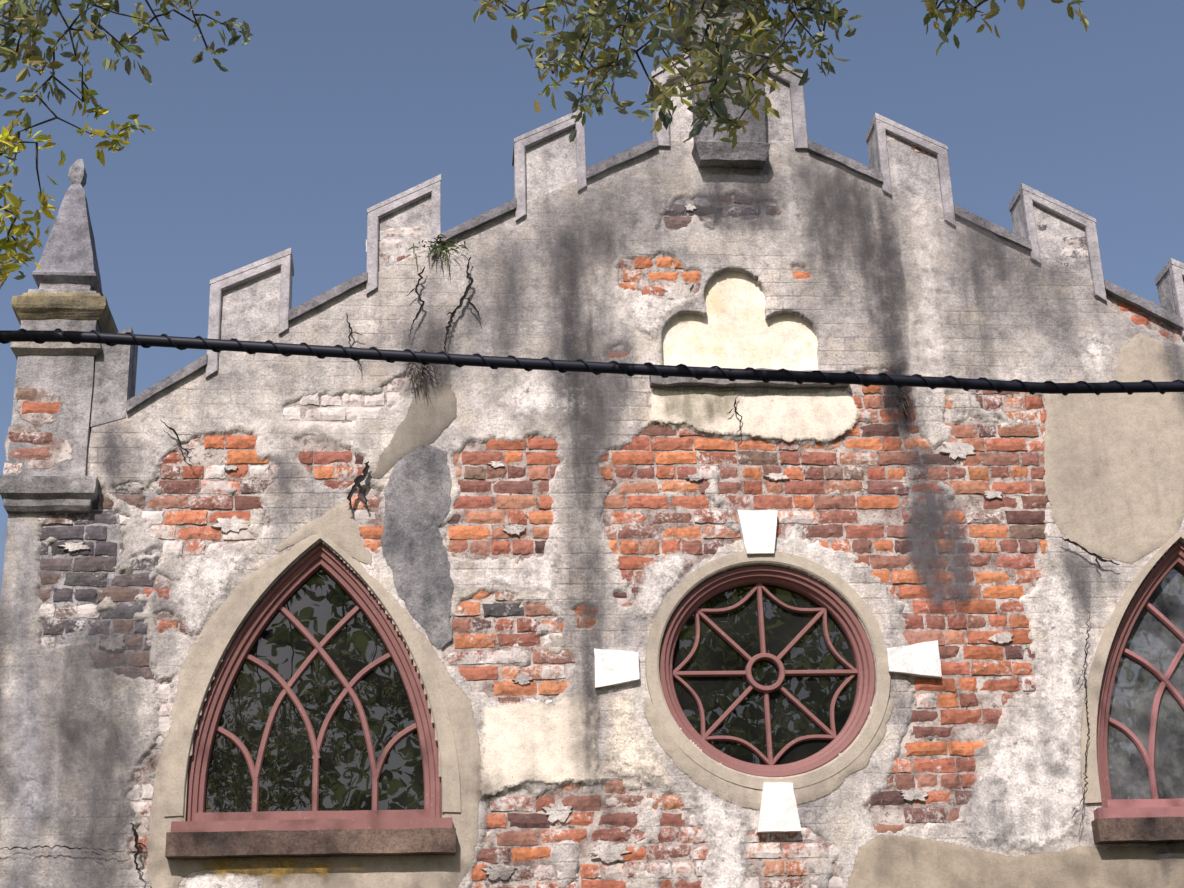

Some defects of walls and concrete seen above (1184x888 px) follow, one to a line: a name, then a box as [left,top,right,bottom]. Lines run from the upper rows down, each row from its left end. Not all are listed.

crack [407,256,481,352]
water stain [808,171,903,367]
flaking render [37,432,279,870]
crack [160,419,194,466]
flaking render [443,435,561,564]
flaking render [443,590,598,705]
flaking render [598,368,1049,833]
water stain [906,455,970,604]
crack [1060,537,1120,568]
crack [1071,612,1091,839]
crack [0,823,152,888]
flaking render [470,779,708,888]